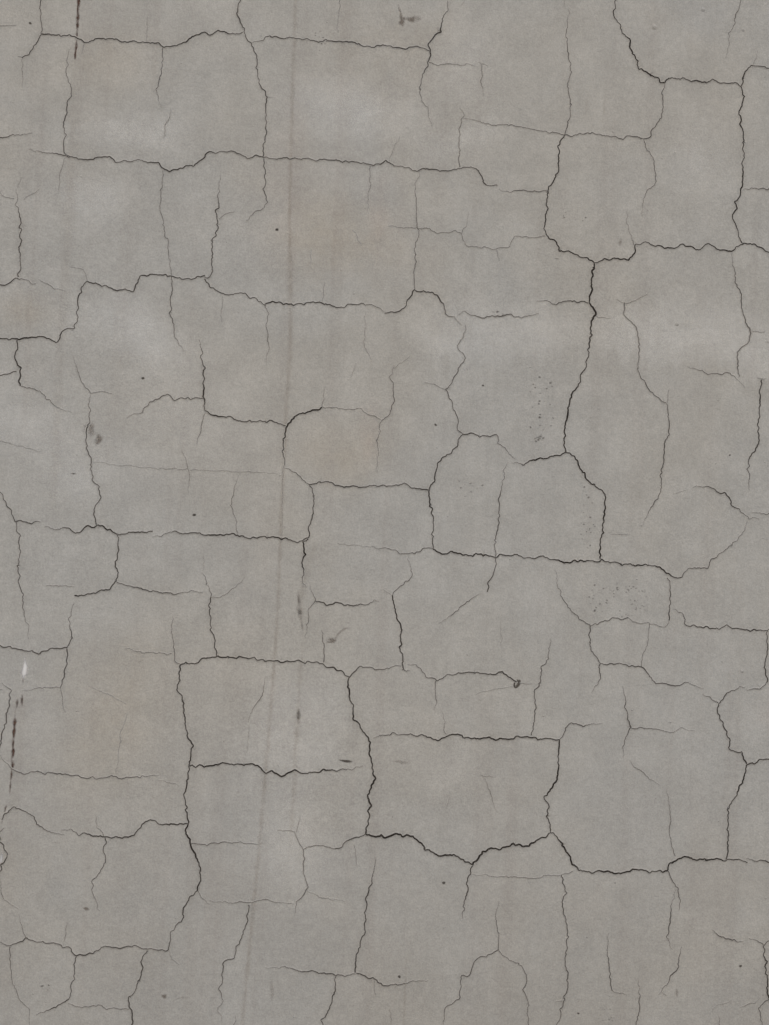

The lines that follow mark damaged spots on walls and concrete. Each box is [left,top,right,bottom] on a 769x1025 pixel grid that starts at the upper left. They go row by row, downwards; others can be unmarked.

crack [0,0,769,413]
crack [0,254,769,1025]